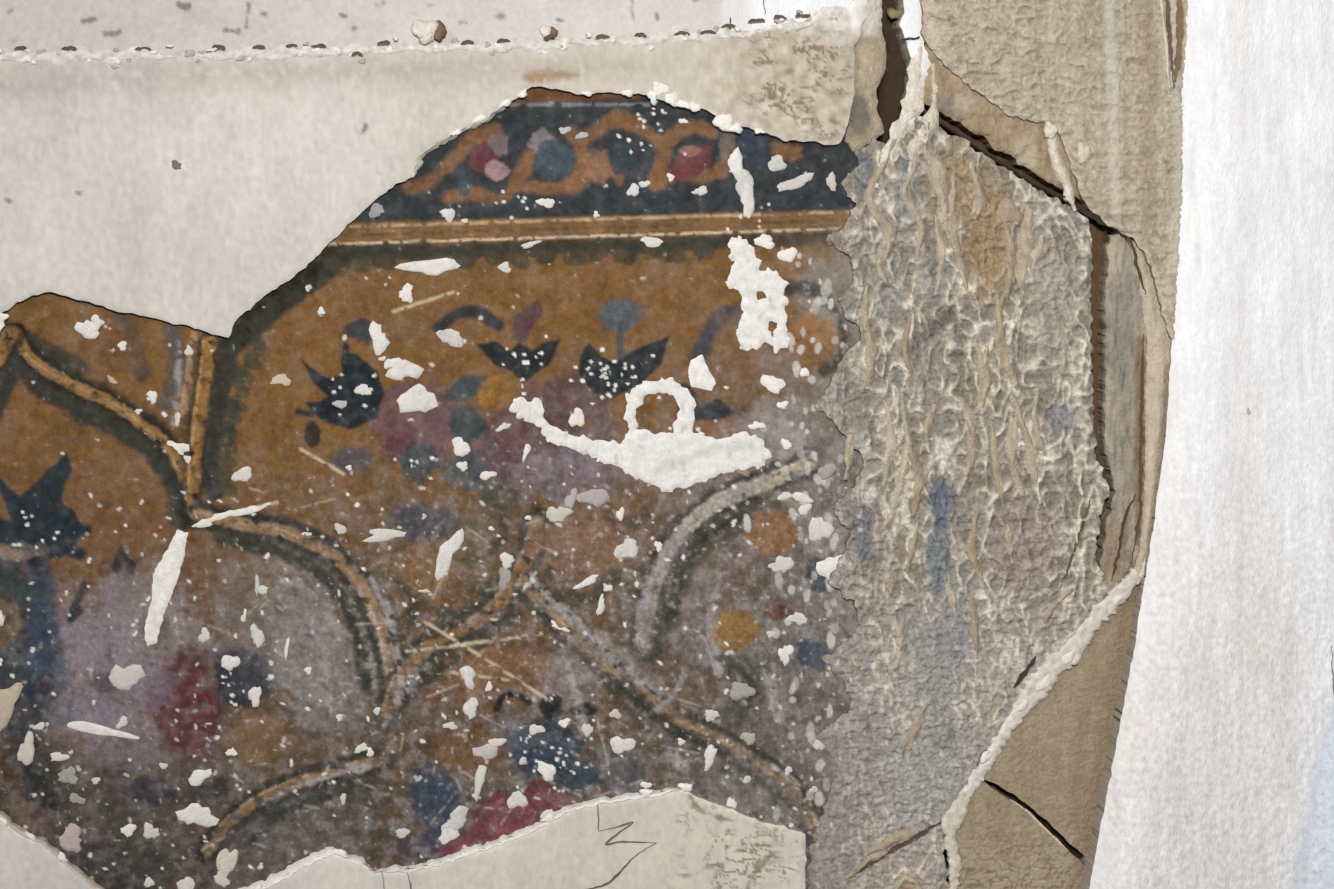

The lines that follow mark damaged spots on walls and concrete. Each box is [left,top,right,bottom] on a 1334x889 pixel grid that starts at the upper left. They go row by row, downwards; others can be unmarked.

flaking render [712,114,766,218]
peeling [768,155,837,192]
peeling [394,258,461,303]
peeling [726,234,798,354]
crack [877,0,1147,588]
peeling [369,321,438,413]
peeling [495,355,792,492]
peeling [144,502,271,649]
peeling [940,557,1146,889]
peeling [176,803,220,827]
flaking render [214,736,693,889]
crack [985,780,1083,859]